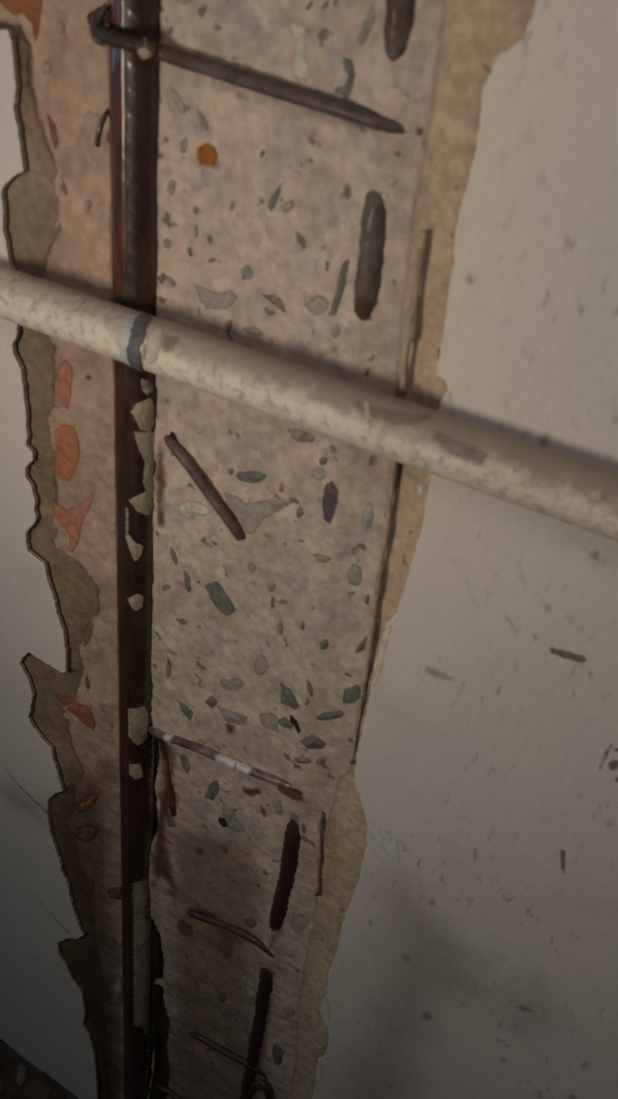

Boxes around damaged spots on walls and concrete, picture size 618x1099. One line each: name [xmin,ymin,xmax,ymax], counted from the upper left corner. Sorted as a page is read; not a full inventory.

spalling [0,0,536,415]
corrosion [156,453,164,525]
spalling [16,325,431,1099]
corrosion [152,741,176,887]
corrosion [277,784,302,800]